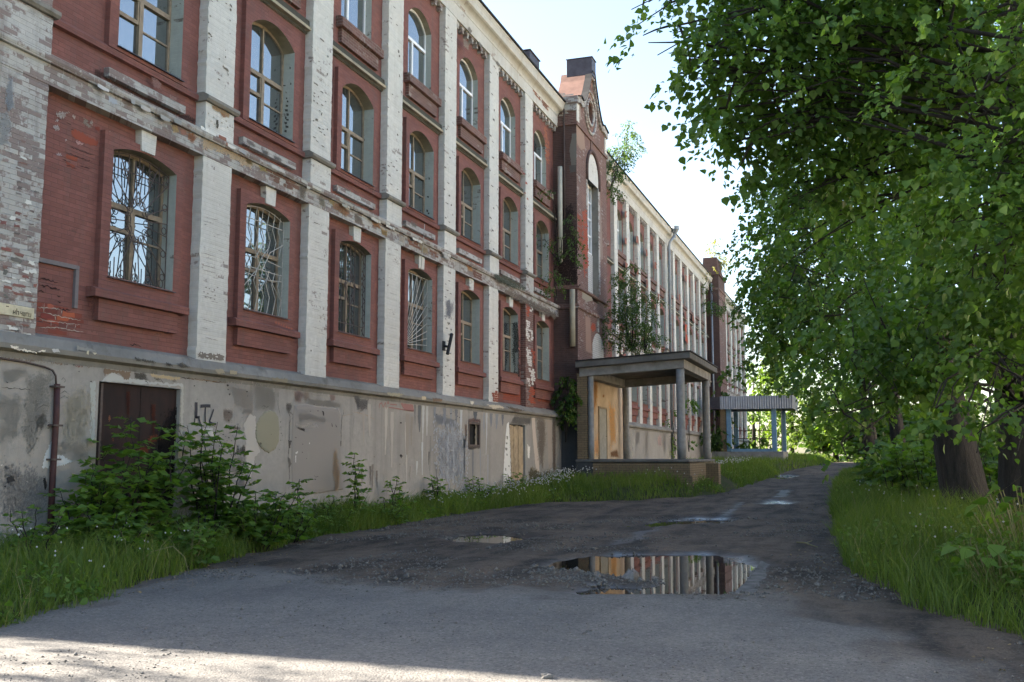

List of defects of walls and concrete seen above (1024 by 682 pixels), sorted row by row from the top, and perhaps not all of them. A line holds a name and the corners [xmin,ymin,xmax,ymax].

spalling [53,111,100,169]
flaking render [266,155,299,190]
flaking render [0,210,84,336]
leakage [0,366,54,525]
leakage [385,405,556,485]